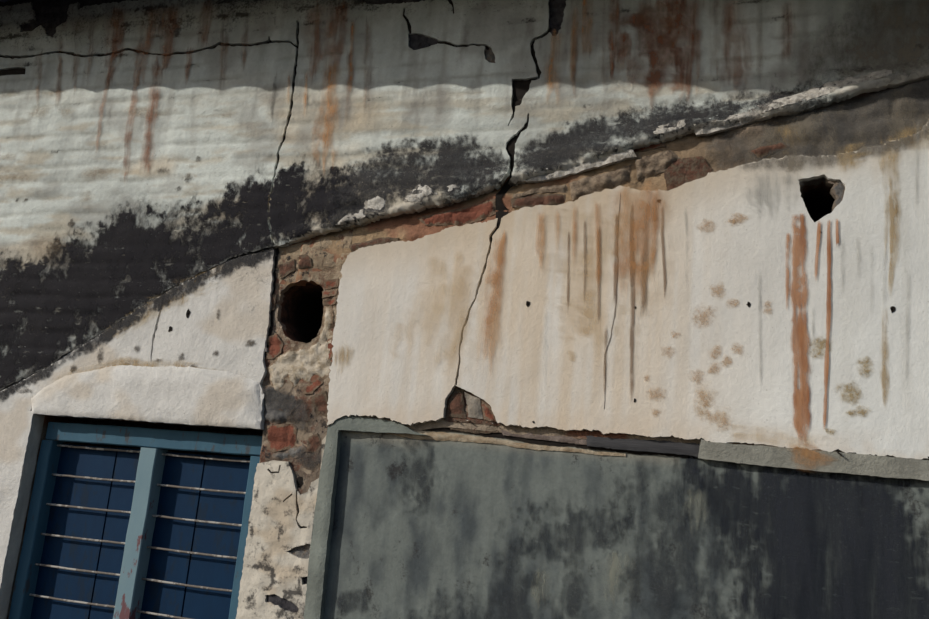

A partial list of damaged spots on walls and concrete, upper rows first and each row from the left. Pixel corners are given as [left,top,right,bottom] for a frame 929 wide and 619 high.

crack [0,22,299,193]
crack [265,248,279,358]
spalling [260,196,399,494]
leakage [0,0,929,402]
crack [461,106,529,343]
corrosion [486,234,505,338]
corrosion [609,0,699,95]
spalling [511,69,896,208]
corrosion [786,214,839,461]
spalling [800,178,845,222]
leakage [838,383,866,416]
leakage [648,455,929,619]